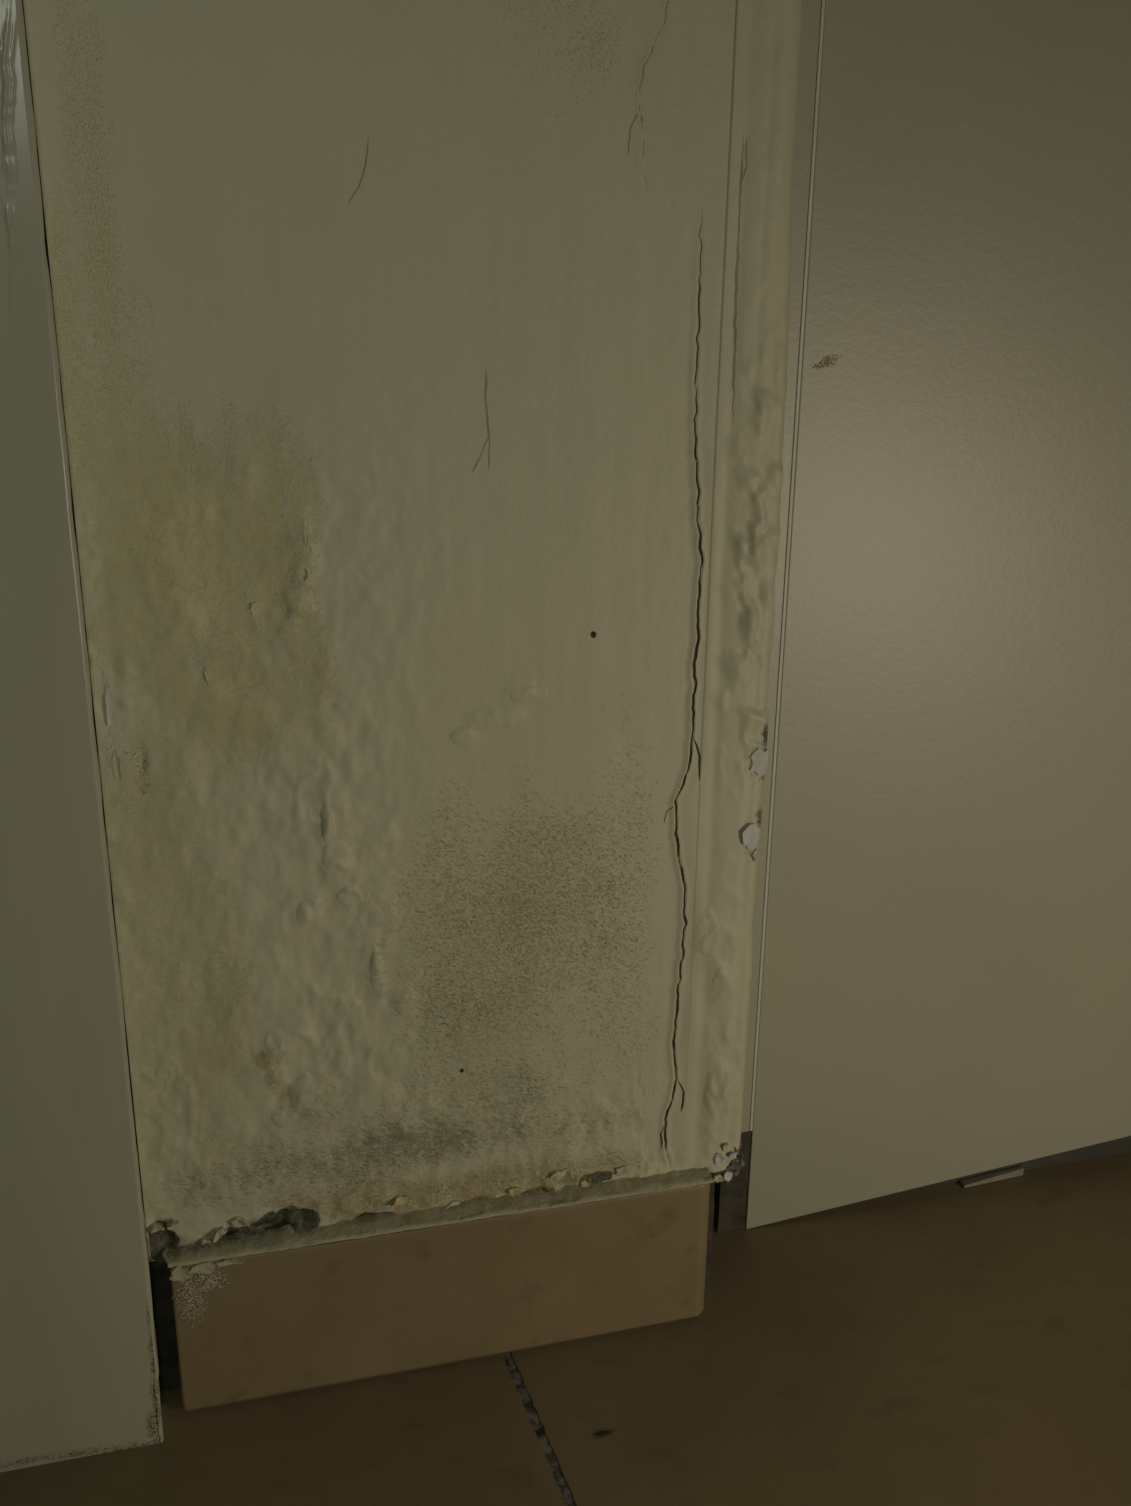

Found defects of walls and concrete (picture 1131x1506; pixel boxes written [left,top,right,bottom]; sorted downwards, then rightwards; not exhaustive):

crack [660,139,747,1164]
spalling [149,1141,746,1328]